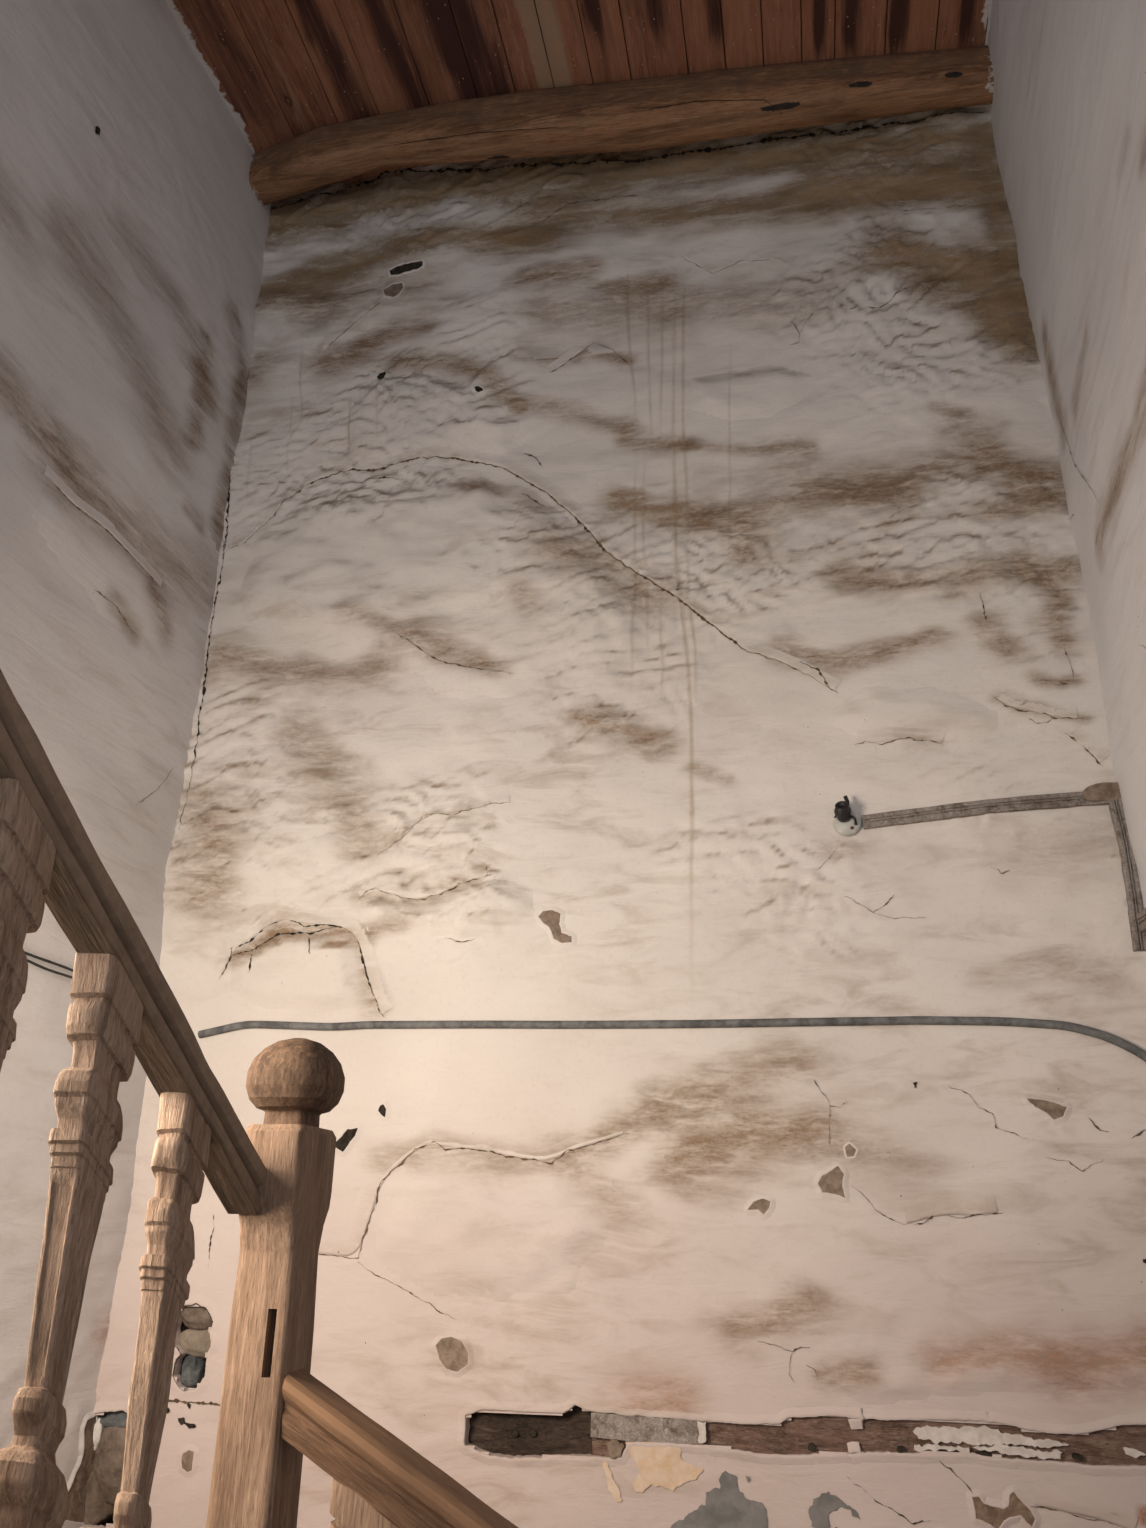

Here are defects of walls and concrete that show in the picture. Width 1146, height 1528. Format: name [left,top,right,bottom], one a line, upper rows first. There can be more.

leakage [255,113,1054,391]
leakage [391,356,526,411]
leakage [962,434,1067,514]
leakage [610,490,756,558]
crack [136,441,843,825]
leakage [792,631,934,667]
leakage [945,561,1073,642]
crack [857,725,946,745]
flaking render [534,905,577,948]
leakage [671,1115,828,1178]
crack [318,1119,624,1320]
flaking render [457,1395,1146,1528]